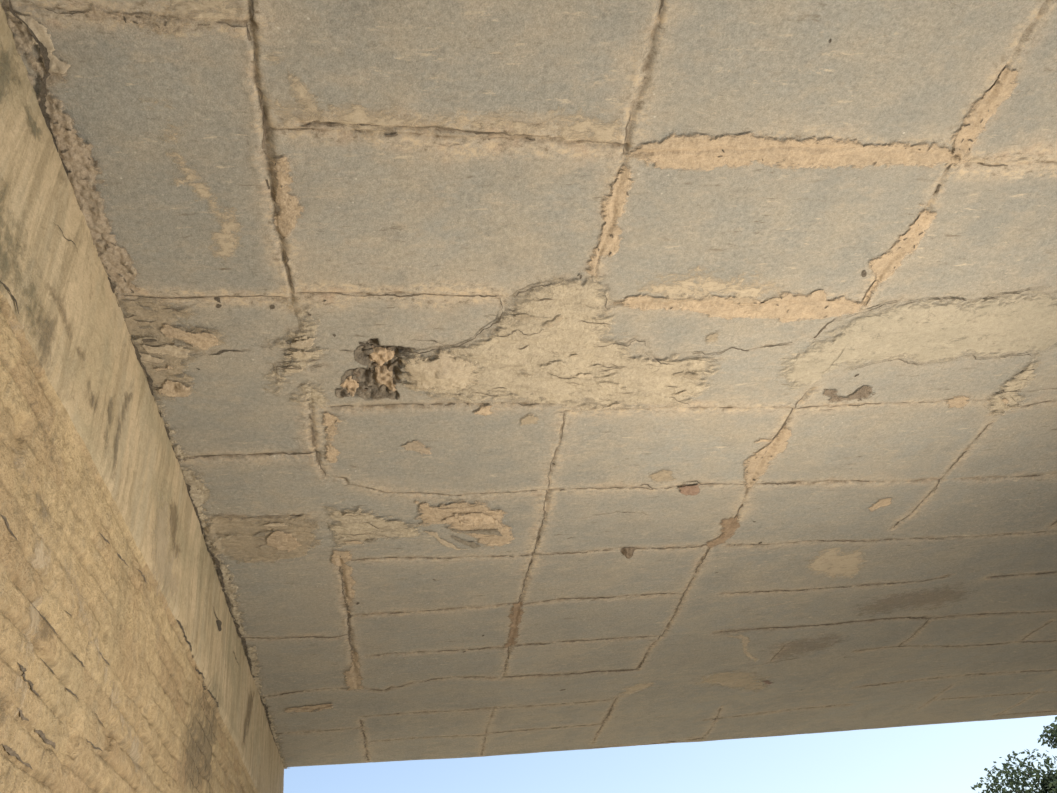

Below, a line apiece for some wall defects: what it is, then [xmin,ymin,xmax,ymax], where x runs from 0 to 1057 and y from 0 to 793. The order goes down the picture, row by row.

crack [9,0,69,180]
spalling [7,7,224,401]
crack [396,279,573,354]
crack [194,339,347,374]
spalling [335,342,376,397]
crack [53,222,279,753]
flaking render [415,500,515,550]